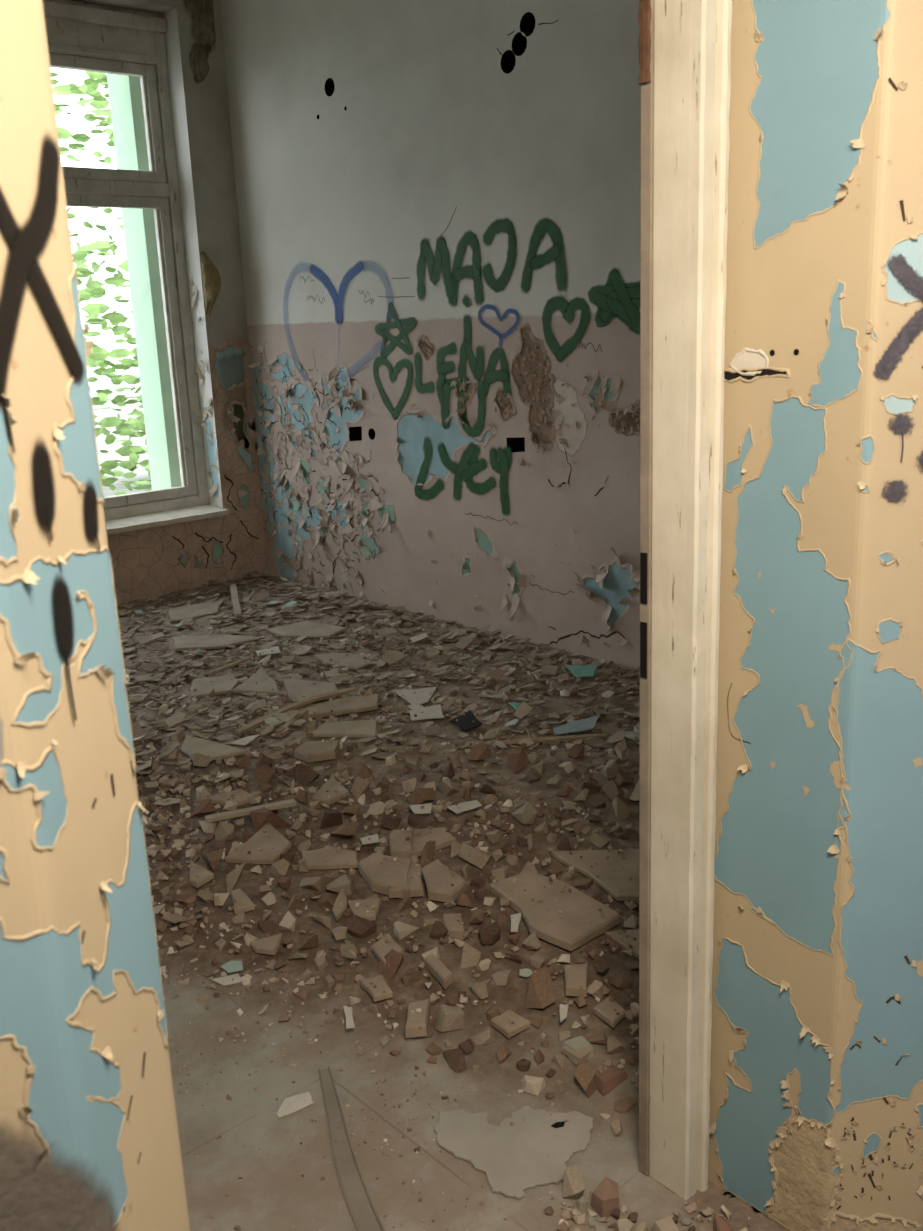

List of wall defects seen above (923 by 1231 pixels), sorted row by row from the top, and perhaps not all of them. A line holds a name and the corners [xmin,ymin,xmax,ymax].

peeling [748,0,908,250]
peeling [881,200,923,306]
peeling [0,394,135,772]
peeling [53,264,104,506]
peeling [194,340,397,596]
peeling [395,322,640,489]
peeling [573,547,640,648]
peeling [0,739,69,852]
peeling [709,279,923,1231]
peeling [0,801,168,1226]